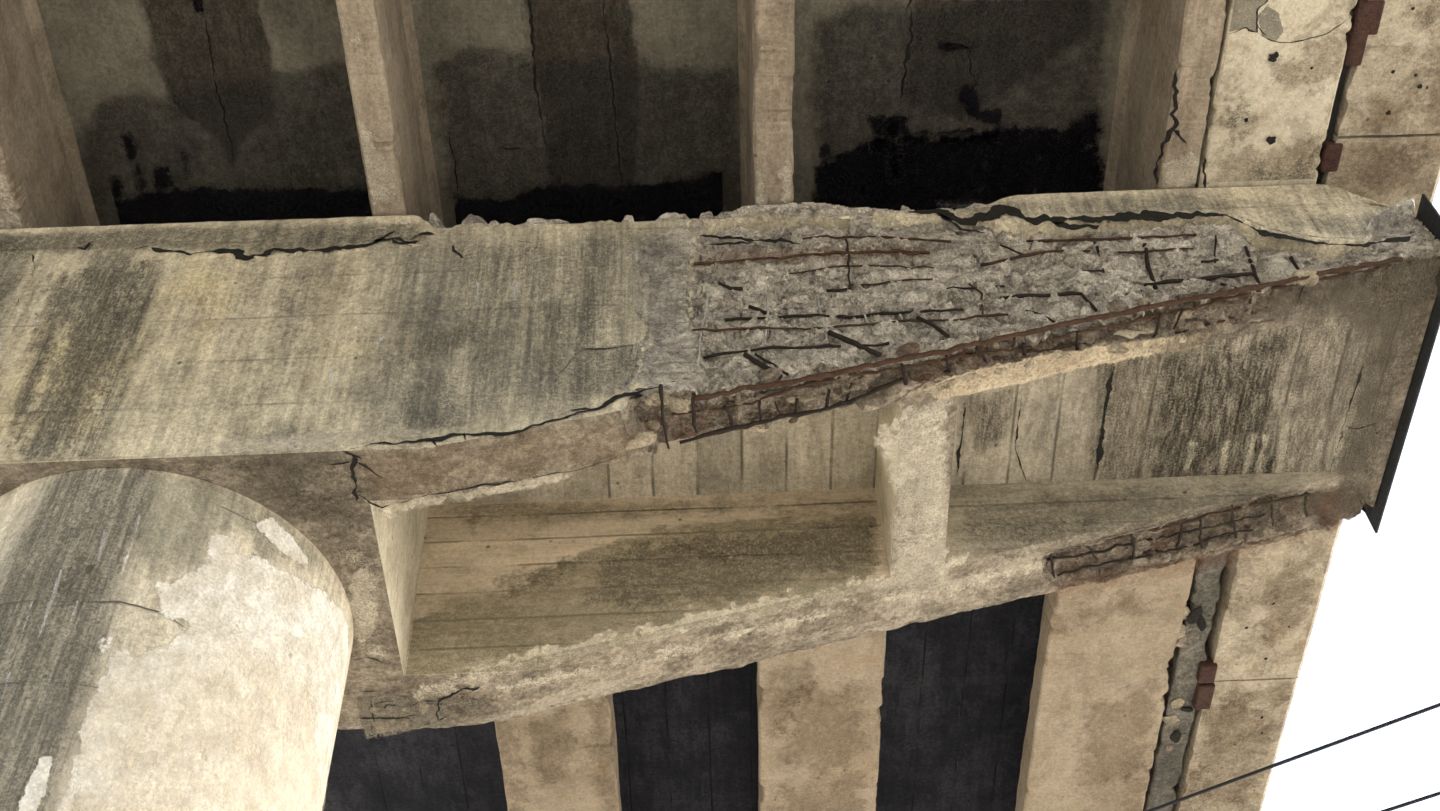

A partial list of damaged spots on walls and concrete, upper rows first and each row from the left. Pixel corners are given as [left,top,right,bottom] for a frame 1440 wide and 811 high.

crack [135,231,464,262]
spalling [429,212,570,228]
leakage [436,0,741,219]
leakage [816,0,1108,205]
crack [908,70,1422,247]
peeling [1229,0,1283,62]
leakage [0,0,417,811]
crack [330,344,669,508]
spalling [617,158,1440,589]
crack [0,600,187,629]
peeling [18,517,503,811]
leakage [406,517,1043,699]